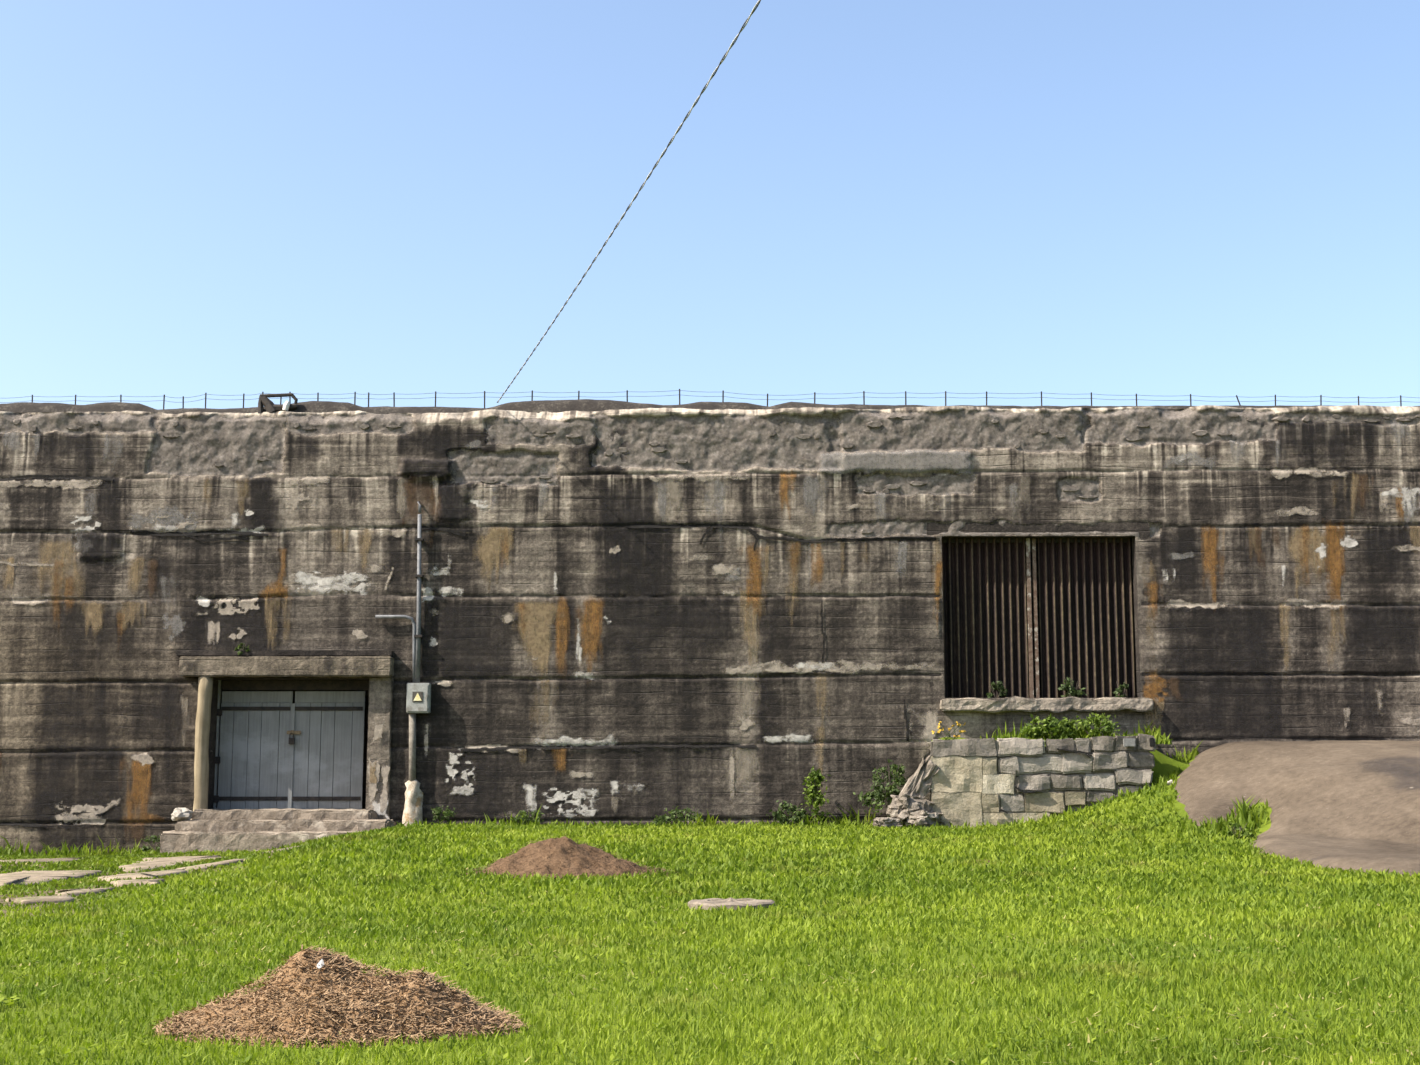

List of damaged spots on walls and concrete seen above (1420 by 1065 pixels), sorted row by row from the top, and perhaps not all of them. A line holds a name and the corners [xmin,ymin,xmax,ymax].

damp [0,432,121,559]
damp [1315,488,1420,561]
rust [1351,474,1420,547]
damp [163,596,271,650]
damp [295,565,394,595]
rust [517,599,602,701]
damp [726,634,931,730]
rust [1203,529,1216,603]
rust [1250,524,1345,662]
rust [124,760,154,840]
damp [446,744,517,795]
damp [523,771,618,818]